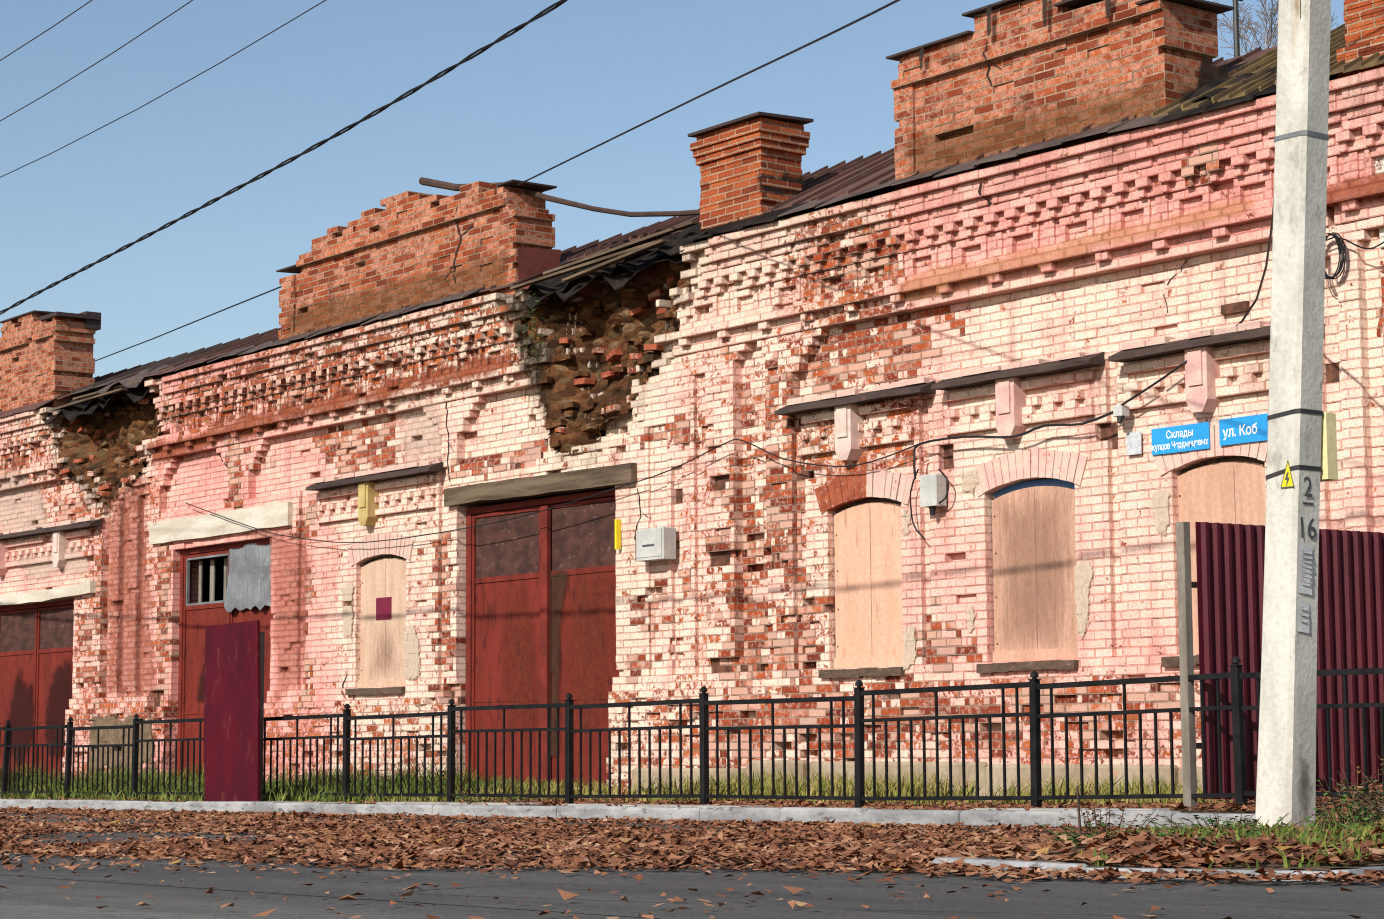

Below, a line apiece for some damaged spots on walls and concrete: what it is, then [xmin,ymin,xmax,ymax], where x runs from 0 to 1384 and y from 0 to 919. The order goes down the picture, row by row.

peeling [640,413,690,450]
peeling [41,497,91,532]
peeling [705,217,1181,768]
peeling [65,542,199,731]
peeling [627,569,691,684]